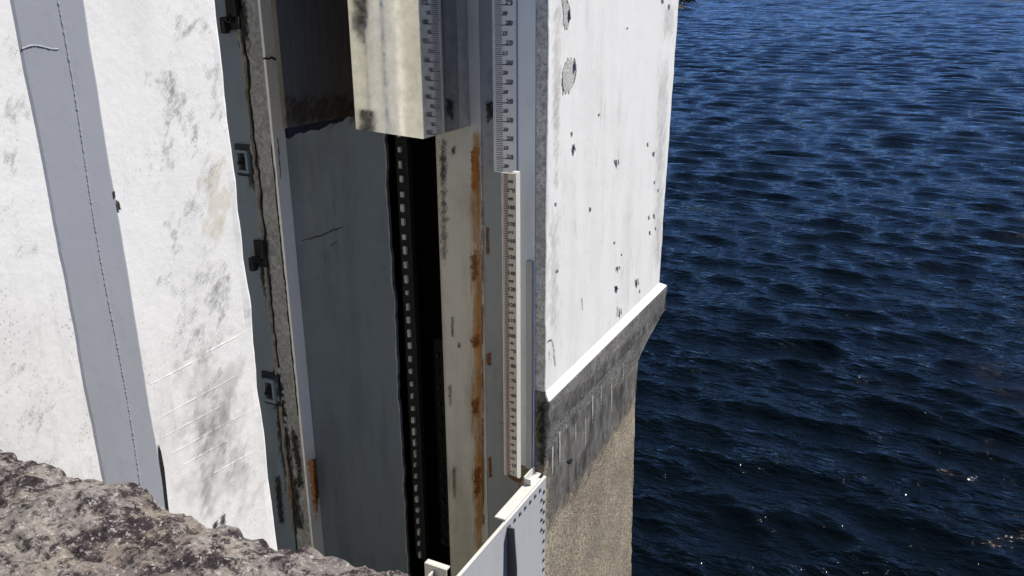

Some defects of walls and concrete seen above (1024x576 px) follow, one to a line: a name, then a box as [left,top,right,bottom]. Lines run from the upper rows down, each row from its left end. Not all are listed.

peeling [562,0,571,30]
peeling [562,57,577,95]
corrosion [470,136,492,548]
damp [537,308,666,525]
corrosion [307,458,319,518]